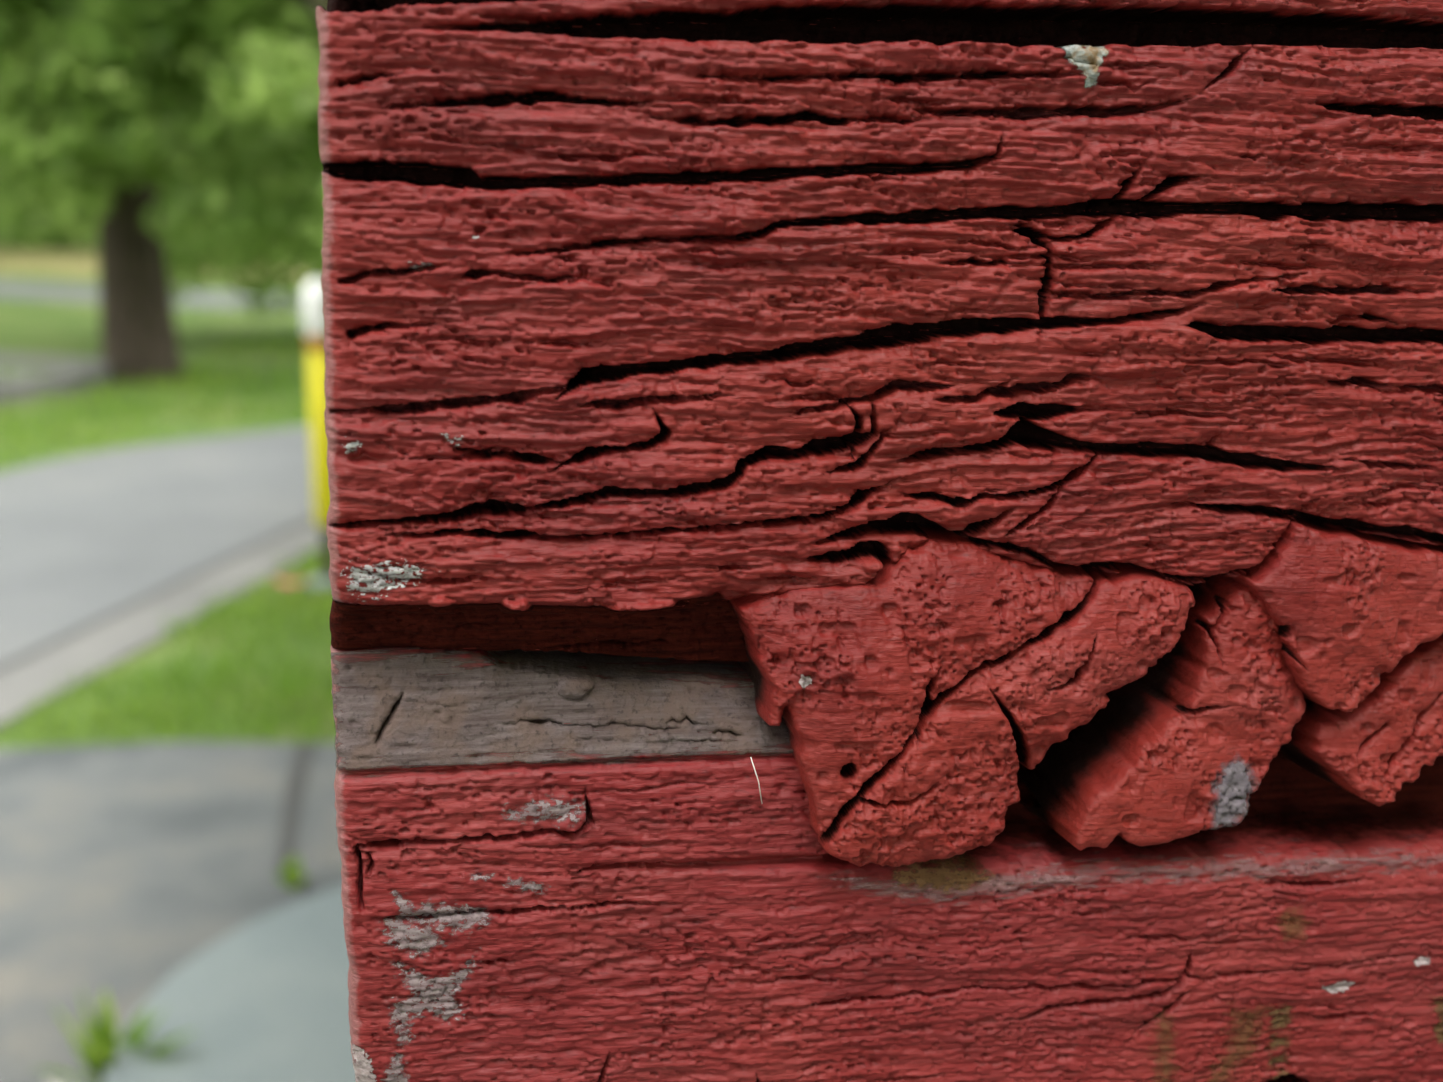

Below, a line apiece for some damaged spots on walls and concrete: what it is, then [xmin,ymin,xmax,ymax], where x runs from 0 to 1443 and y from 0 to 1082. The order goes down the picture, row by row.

crack [321,0,1443,189]
peeling [1055,45,1109,88]
crack [329,172,1443,566]
peeling [340,558,441,602]
crack [1088,561,1245,581]
peeling [1212,760,1253,830]
peeling [350,890,490,1082]
crack [1265,1074,1307,1082]